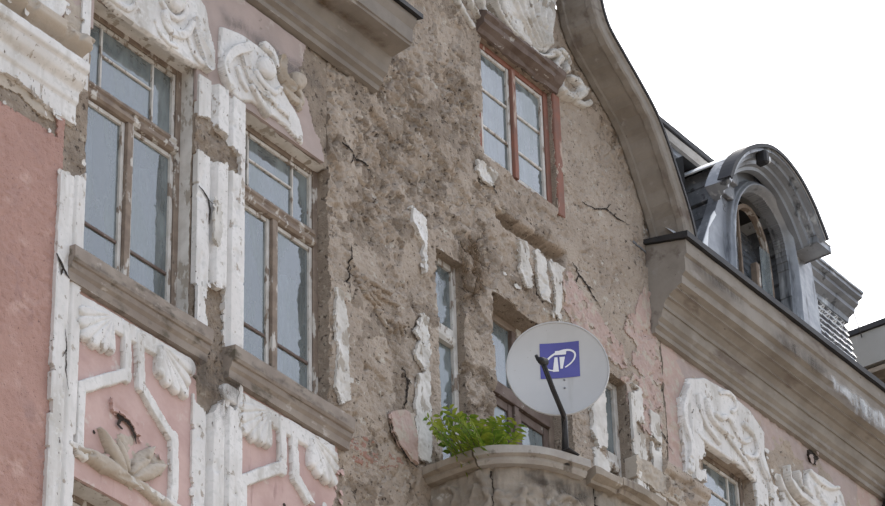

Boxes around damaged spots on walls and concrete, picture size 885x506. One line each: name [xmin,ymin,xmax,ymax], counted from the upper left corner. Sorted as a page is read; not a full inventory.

spalling [63,0,82,32]
spalling [0,74,86,178]
spalling [192,113,244,173]
crack [583,202,629,225]
spalling [189,279,243,414]
spalling [109,398,165,491]